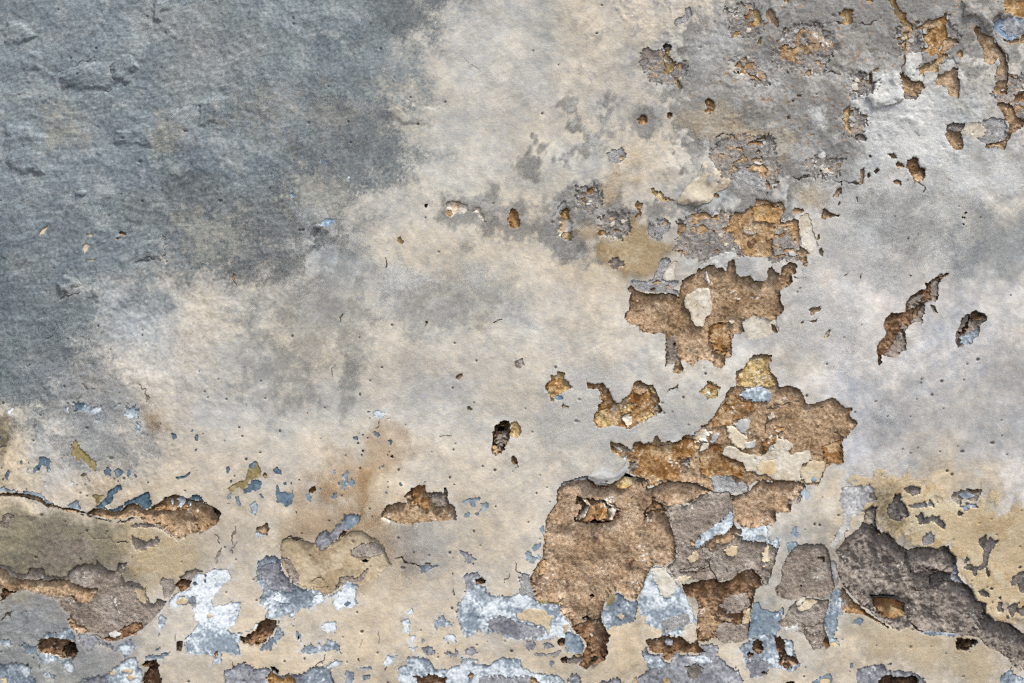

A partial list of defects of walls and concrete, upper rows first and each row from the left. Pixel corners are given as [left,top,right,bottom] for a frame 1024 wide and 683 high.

spalling [638,44,689,89]
spalling [722,2,835,87]
spalling [838,9,853,25]
spalling [888,0,963,100]
spalling [945,0,1024,150]
leakage [172,199,255,267]
leakage [275,161,351,228]
spalling [554,132,847,374]
spalling [876,273,948,365]
spalling [955,311,986,347]
spalling [0,354,1024,683]